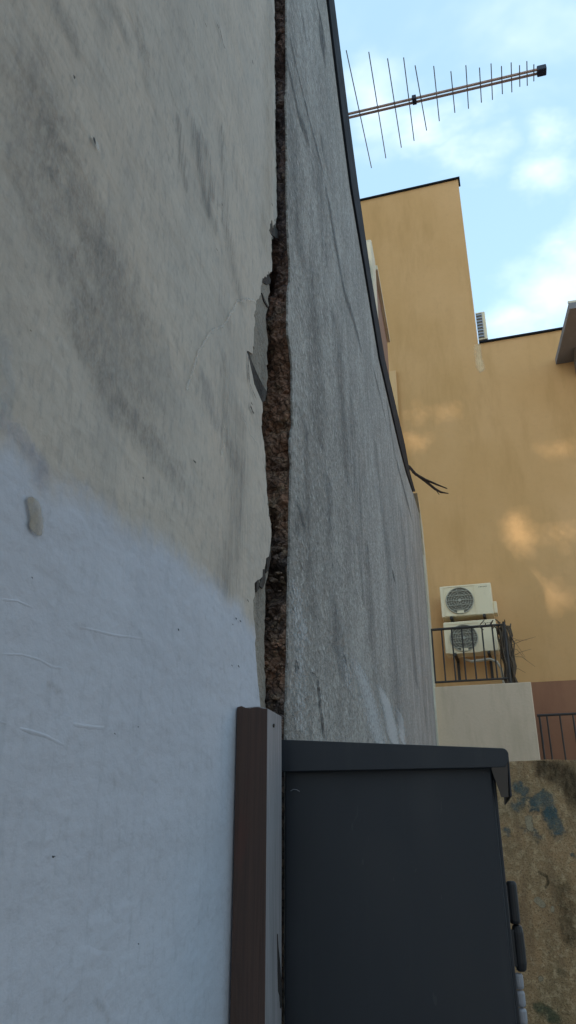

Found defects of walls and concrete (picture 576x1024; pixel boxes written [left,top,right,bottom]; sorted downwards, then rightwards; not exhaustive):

crack [247,0,325,740]
crack [278,772,286,1024]
leakage [537,761,576,802]